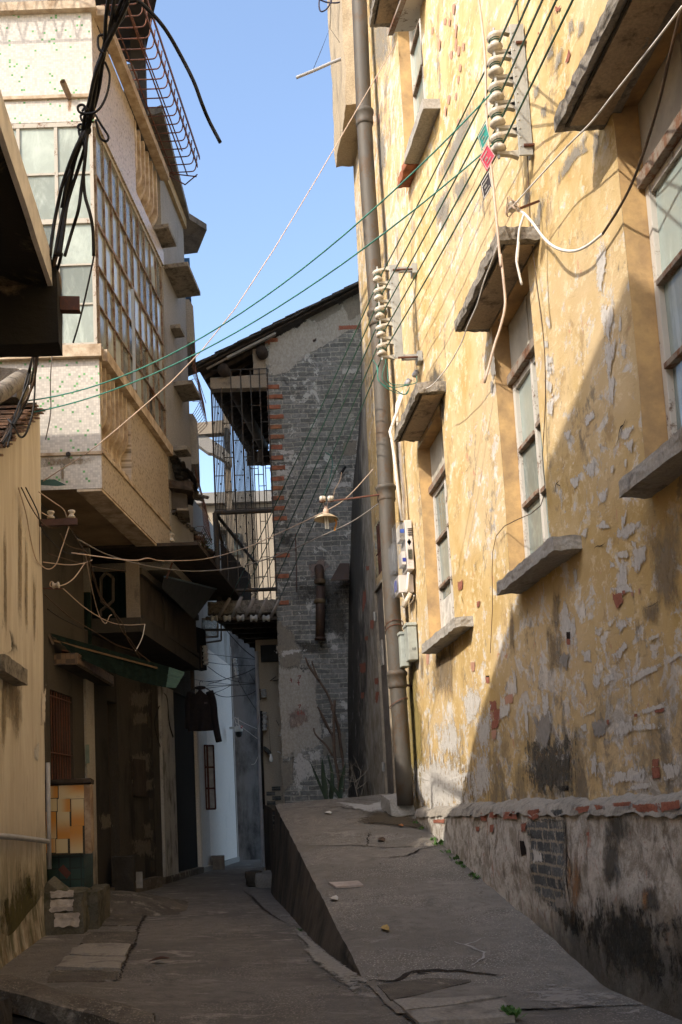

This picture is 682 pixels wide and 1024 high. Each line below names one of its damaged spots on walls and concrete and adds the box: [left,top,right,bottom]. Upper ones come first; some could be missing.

peeling [593,239,626,405]
peeling [544,341,553,414]
flaking render [559,512,682,697]
flaking render [280,714,347,797]
flaking render [411,662,682,916]
damp [603,815,627,887]
crack [119,915,147,979]
crack [364,937,505,1024]
damp [558,888,682,1003]